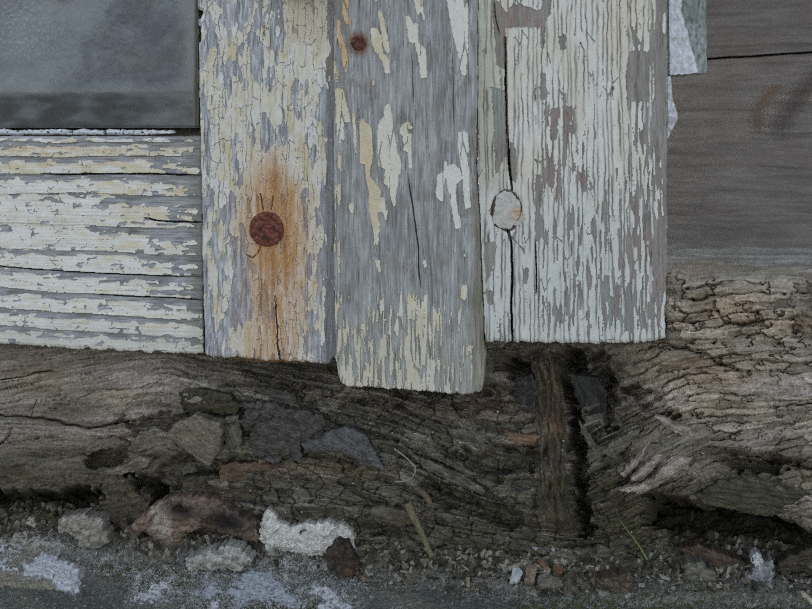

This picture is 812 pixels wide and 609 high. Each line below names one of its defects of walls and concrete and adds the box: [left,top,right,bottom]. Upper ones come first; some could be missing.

peeling [0,0,473,394]
peeling [436,0,698,344]